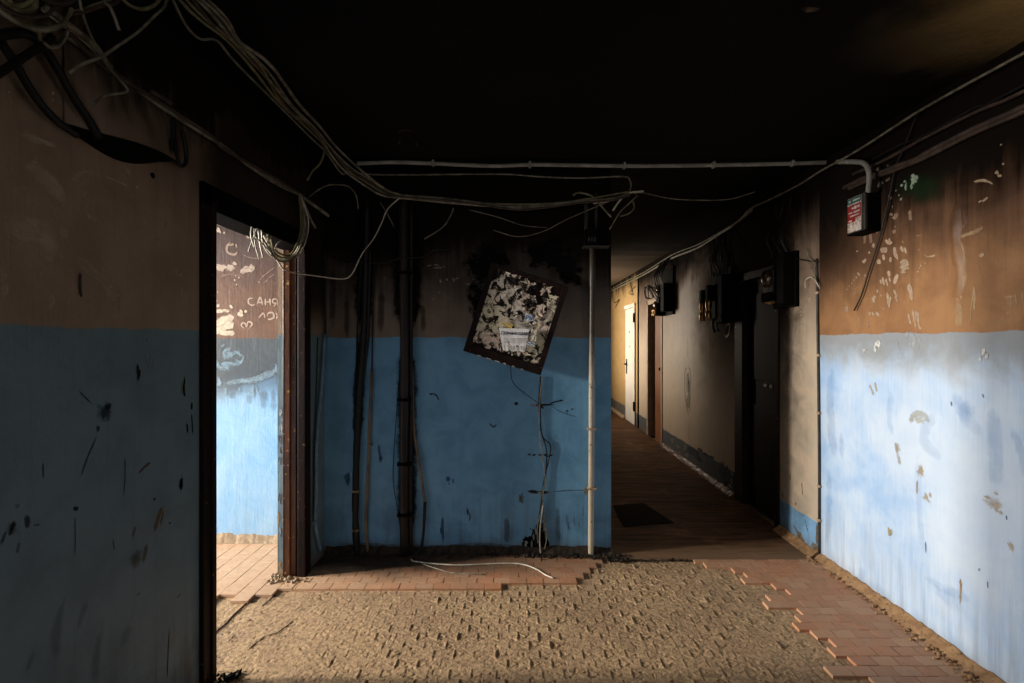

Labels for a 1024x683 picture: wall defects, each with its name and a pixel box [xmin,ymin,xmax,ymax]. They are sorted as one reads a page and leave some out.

peeling [876,164,919,209]